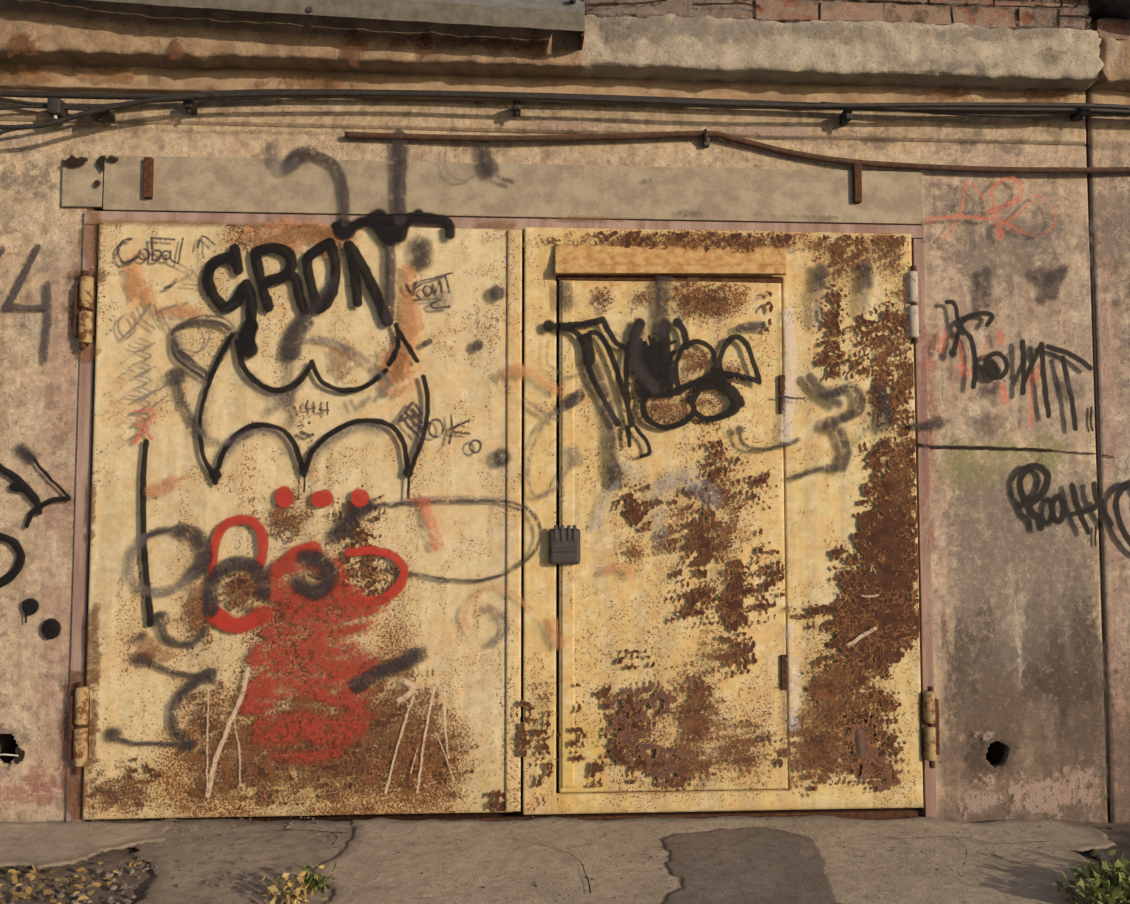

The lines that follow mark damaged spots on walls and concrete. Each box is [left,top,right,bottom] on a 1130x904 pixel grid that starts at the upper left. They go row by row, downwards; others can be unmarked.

corrosion [60,471,508,820]
corrosion [486,230,920,811]
leakage [1001,578,1028,689]